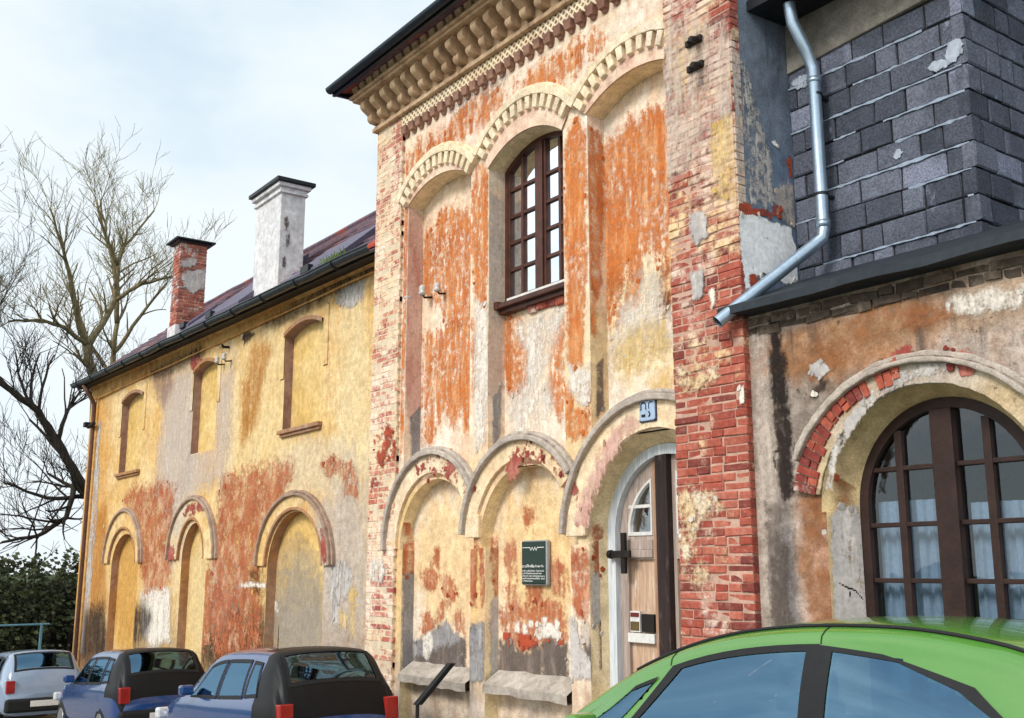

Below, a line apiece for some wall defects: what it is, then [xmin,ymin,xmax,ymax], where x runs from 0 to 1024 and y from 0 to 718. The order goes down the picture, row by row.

spalling [180,258,206,294]
flaking render [689,268,704,300]
flaking render [689,211,708,245]
flaking render [711,112,798,289]
peeling [122,369,294,659]
peeling [320,103,673,683]
water stain [751,317,795,625]
spalling [808,358,830,397]
flaking render [826,344,975,490]